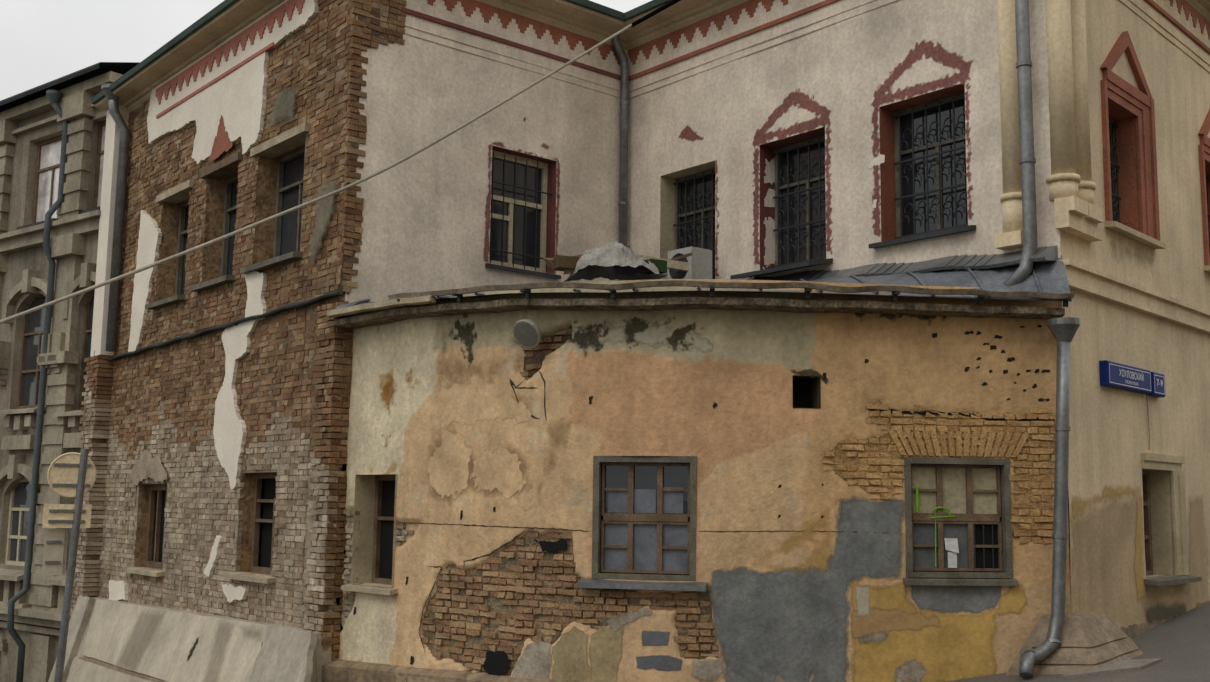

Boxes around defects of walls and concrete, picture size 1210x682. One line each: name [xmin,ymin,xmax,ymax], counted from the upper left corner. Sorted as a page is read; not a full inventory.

spalling [339,0,407,295]
peeling [868,154,885,168]
peeling [763,158,775,269]
water stain [449,314,477,362]
water stain [566,321,609,354]
peeling [519,321,713,381]
water stain [625,317,695,350]
spalling [822,331,1056,544]
spalling [420,531,723,682]